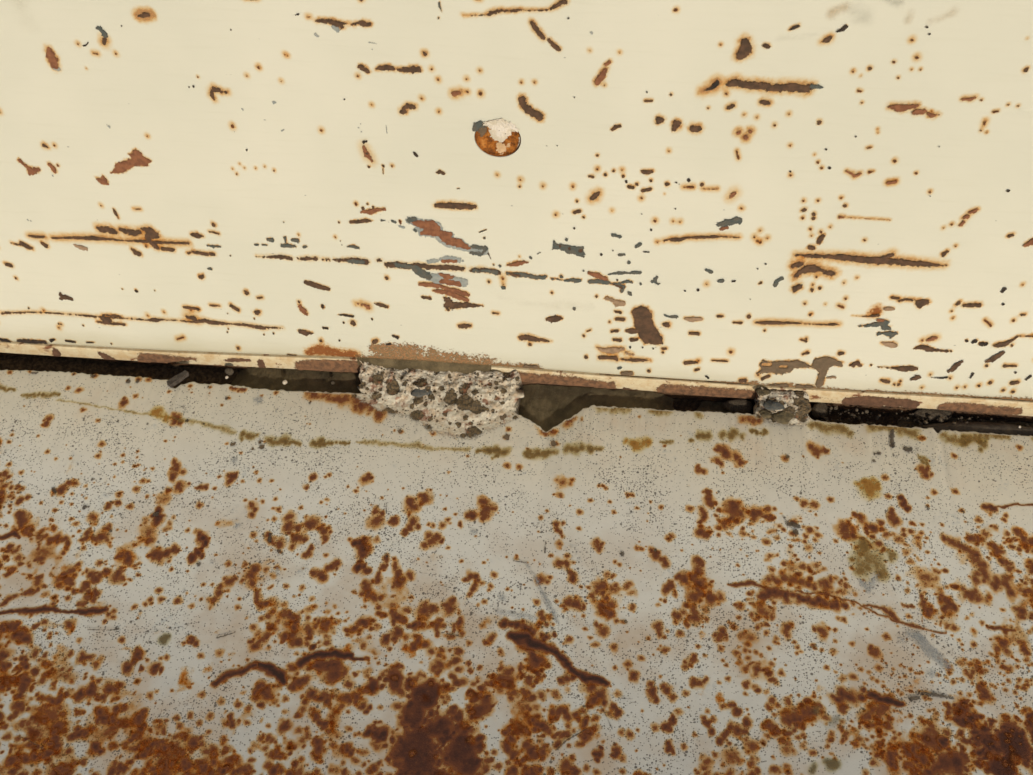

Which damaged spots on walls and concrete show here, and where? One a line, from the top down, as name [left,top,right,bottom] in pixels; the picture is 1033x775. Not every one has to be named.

corrosion [306,345,359,357]
peeling [937,335,1033,416]
corrosion [306,392,385,420]
corrosion [151,408,404,454]
corrosion [445,417,603,468]
corrosion [625,415,768,474]
corrosion [803,444,830,458]
corrosion [810,422,852,435]
corrosion [915,457,933,479]